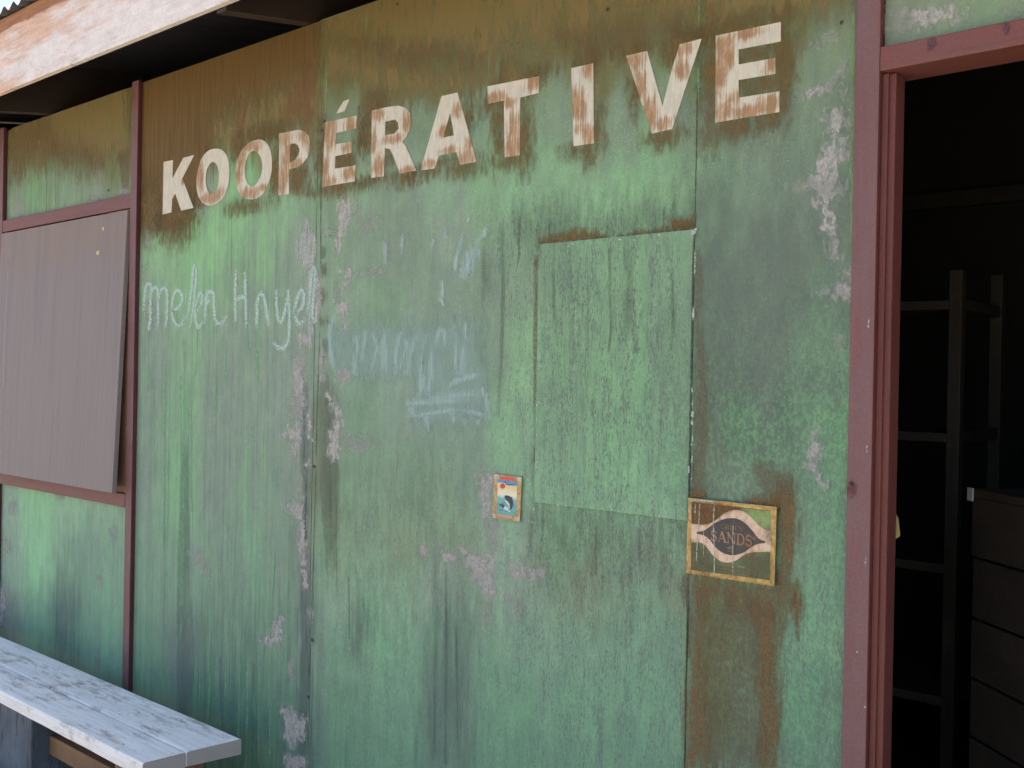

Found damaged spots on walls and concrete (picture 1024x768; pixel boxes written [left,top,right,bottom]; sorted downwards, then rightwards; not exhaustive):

rust [9,0,846,244]
peeling [793,63,852,259]
peeling [819,266,851,303]
peeling [281,195,387,591]
peeling [806,427,829,486]
peeling [259,616,284,649]
peeling [438,464,519,630]
rust [684,481,801,768]
peeling [280,706,308,768]